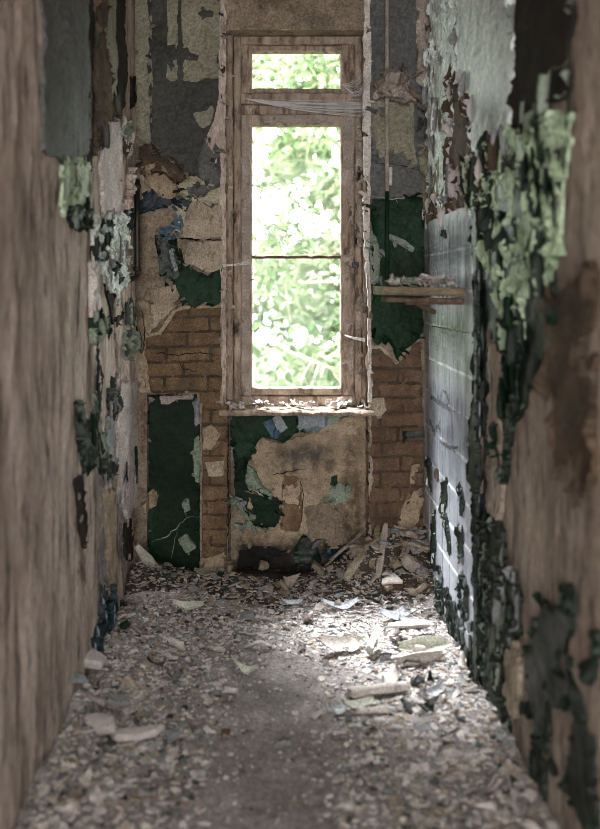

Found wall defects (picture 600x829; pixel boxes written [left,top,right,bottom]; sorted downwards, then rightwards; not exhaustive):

crack [152,513,200,558]
peeling [39,0,353,571]
peeling [263,0,600,829]